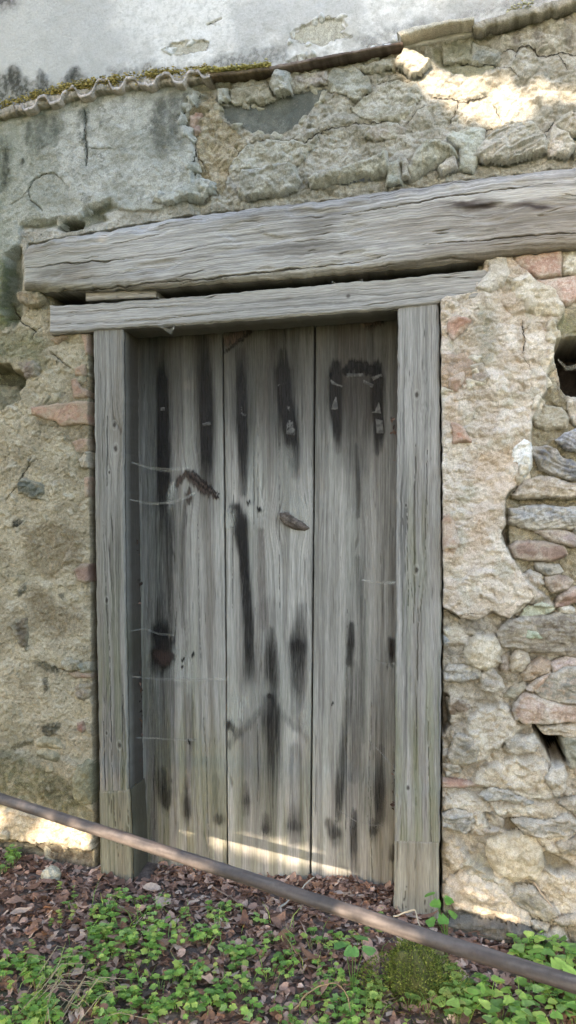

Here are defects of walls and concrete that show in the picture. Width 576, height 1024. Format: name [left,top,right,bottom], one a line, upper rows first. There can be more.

flaking render [161,39,209,56]
flaking render [287,12,348,74]
crack [462,45,576,77]
water stain [0,66,83,109]
spalling [178,86,327,195]